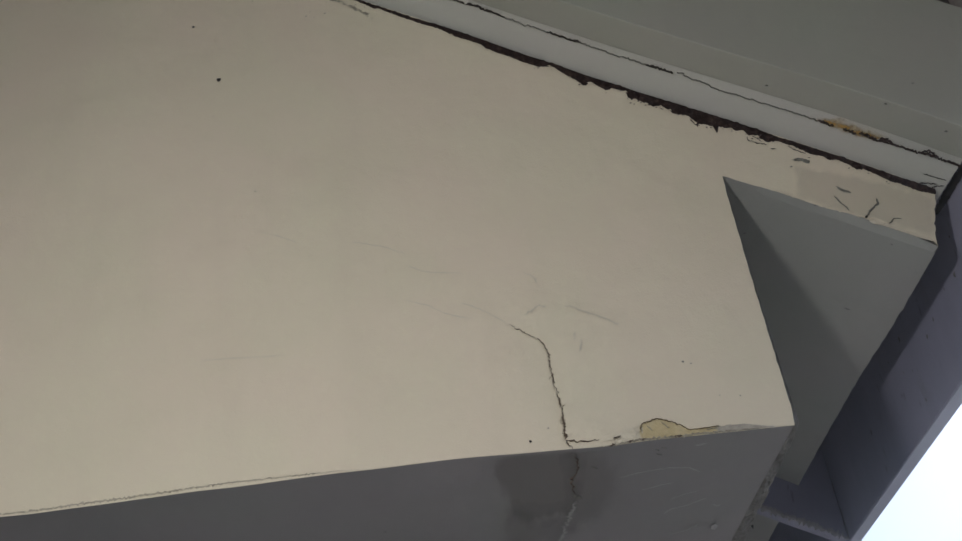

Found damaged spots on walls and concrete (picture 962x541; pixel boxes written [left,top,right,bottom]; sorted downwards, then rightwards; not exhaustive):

crack [453,0,962,188]
crack [506,304,621,541]
spalling [599,418,775,448]